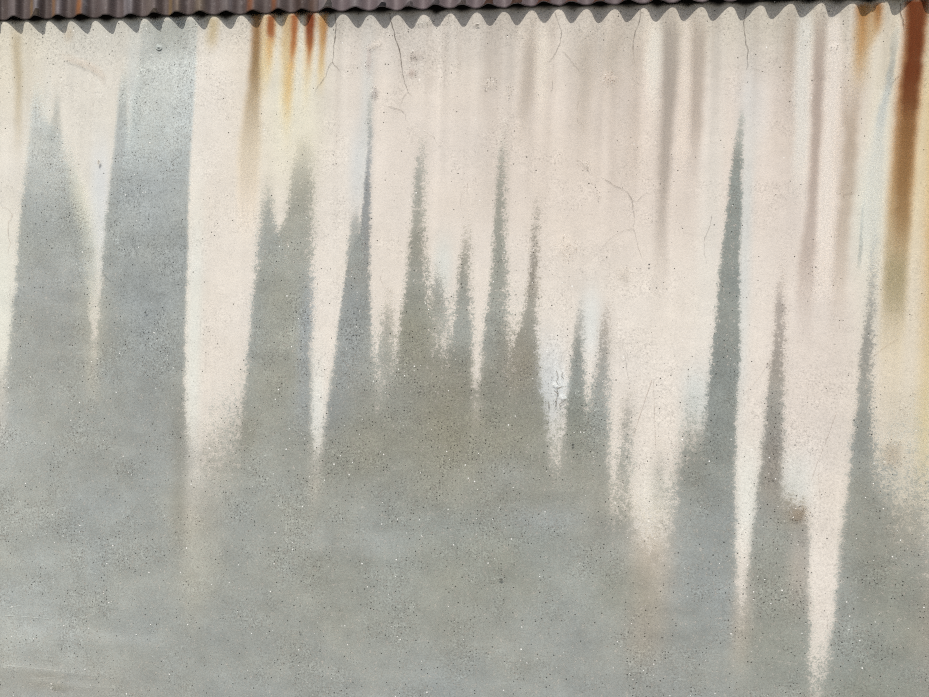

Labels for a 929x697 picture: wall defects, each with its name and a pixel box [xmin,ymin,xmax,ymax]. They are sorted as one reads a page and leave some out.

corrosion [241,16,274,172]
corrosion [283,14,325,100]
corrosion [889,0,929,248]
leakage [617,409,634,472]